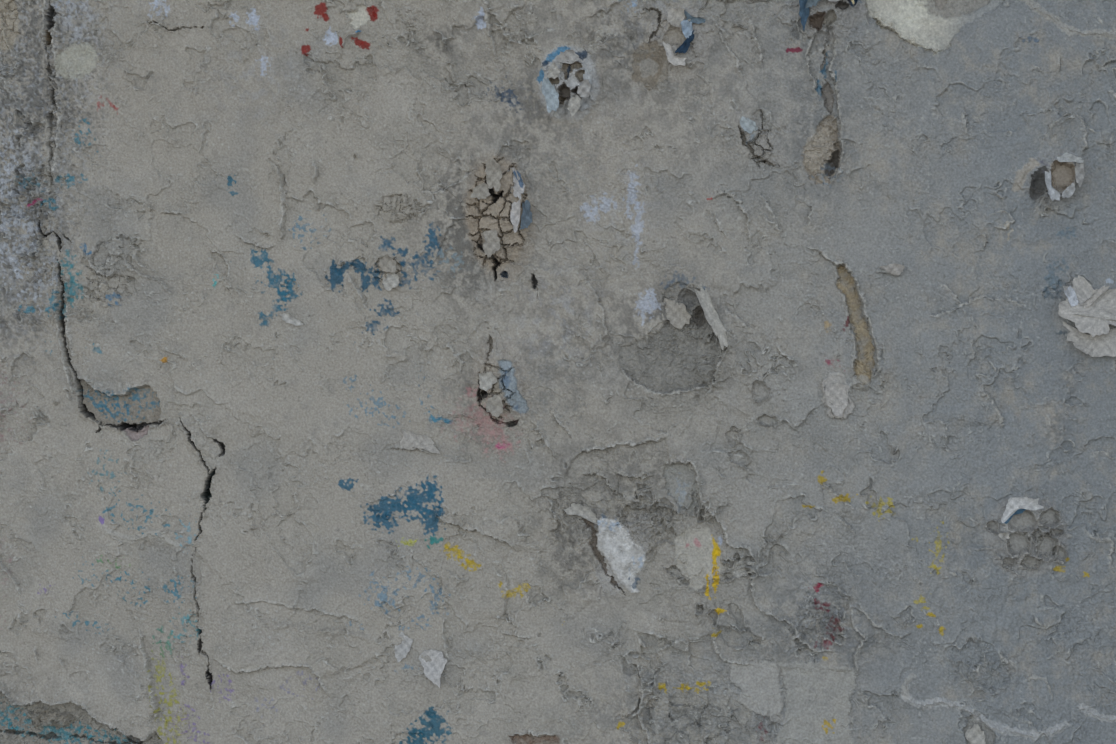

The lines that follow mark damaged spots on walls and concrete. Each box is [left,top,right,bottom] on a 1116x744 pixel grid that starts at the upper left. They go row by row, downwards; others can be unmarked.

spalling [867,0,1004,57]
spalling [795,31,858,193]
spalling [75,363,161,441]
crack [31,0,226,690]
spalling [560,270,778,624]
spalling [806,230,905,392]
spalling [0,630,164,744]
peeling [729,660,857,744]